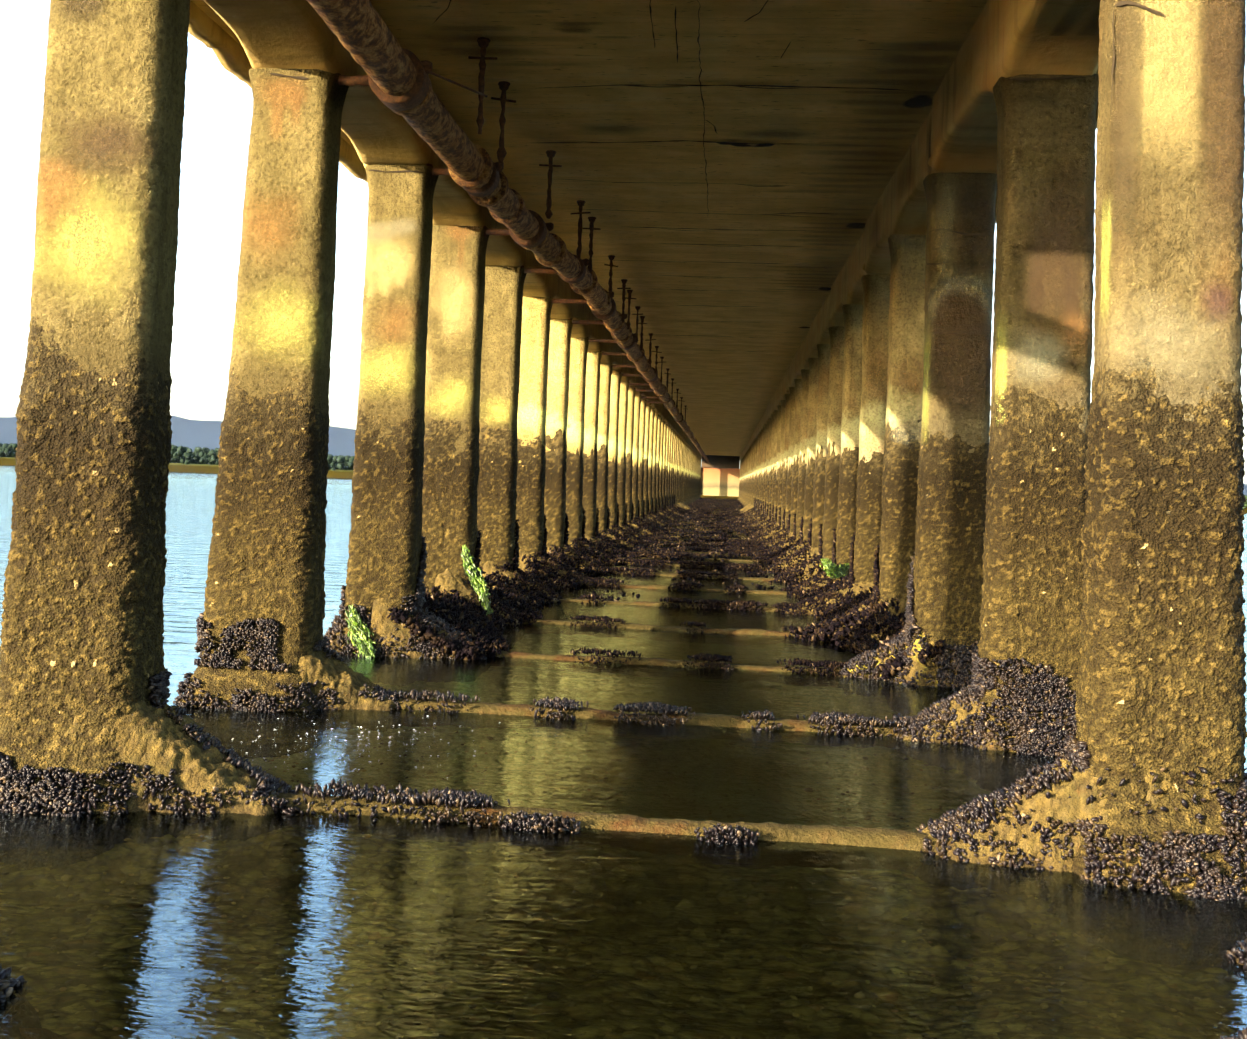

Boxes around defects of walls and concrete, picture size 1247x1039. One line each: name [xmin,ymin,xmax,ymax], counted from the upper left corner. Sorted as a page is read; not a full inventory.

crack [540,0,924,352]